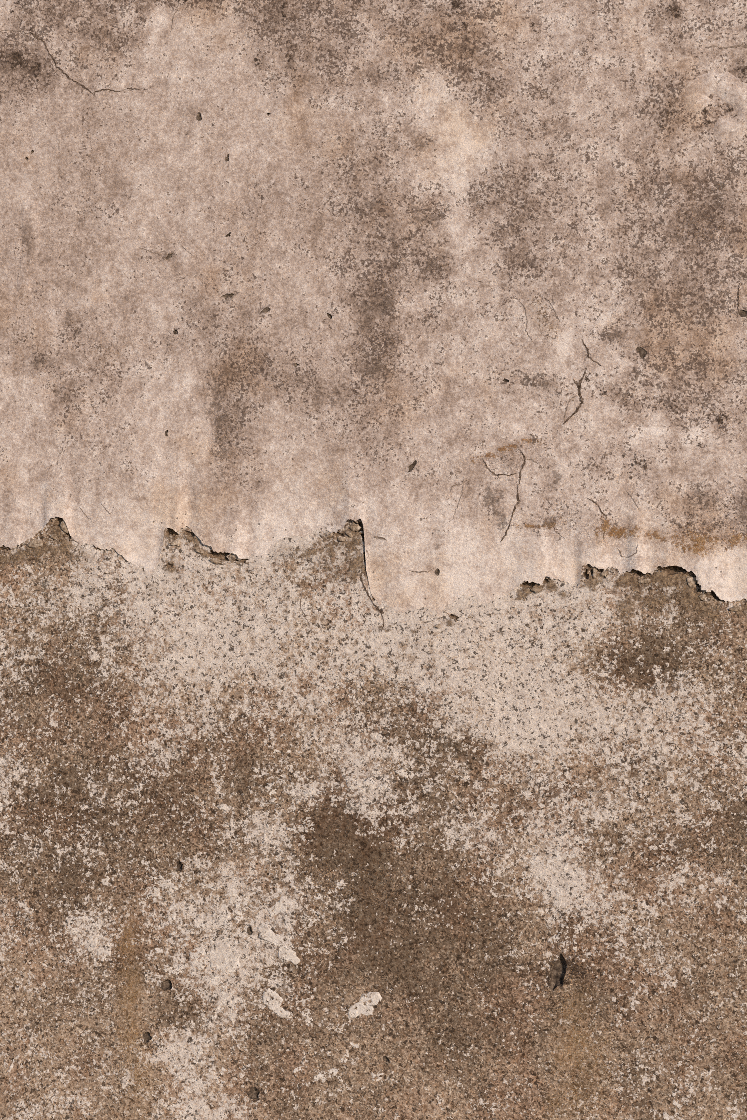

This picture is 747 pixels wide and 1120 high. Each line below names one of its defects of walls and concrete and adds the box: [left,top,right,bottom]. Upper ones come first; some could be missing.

leakage [0,51,49,81]
crack [0,29,147,94]
leakage [447,0,495,95]
crack [447,444,537,541]
spalling [163,528,249,573]
spalling [279,521,367,585]
spalling [515,578,569,601]
spalling [580,565,747,629]
peeling [252,771,336,845]
peeling [146,855,300,1024]
spalling [543,932,577,1001]
peeling [347,992,382,1018]